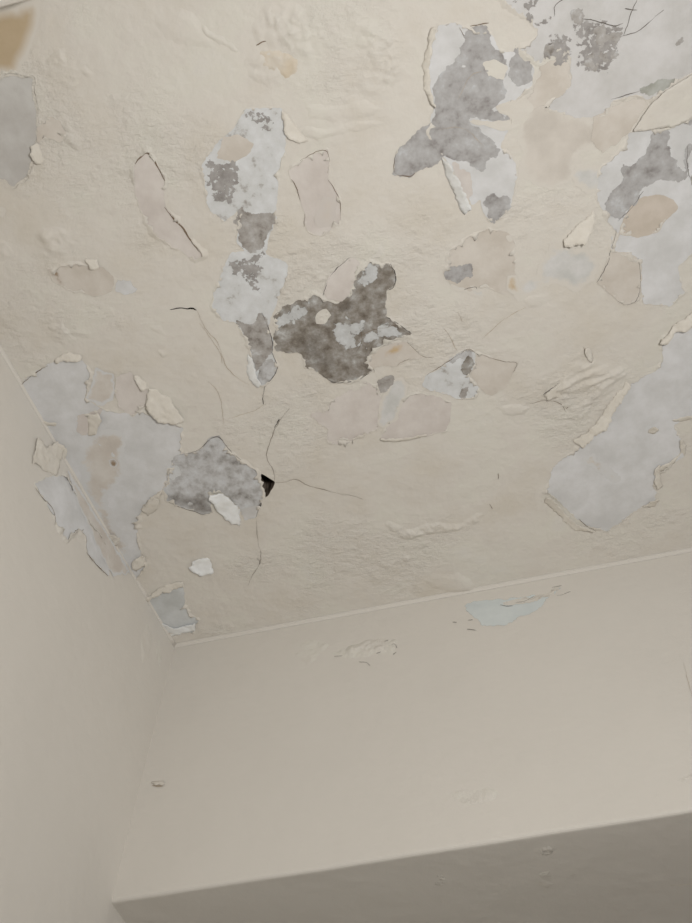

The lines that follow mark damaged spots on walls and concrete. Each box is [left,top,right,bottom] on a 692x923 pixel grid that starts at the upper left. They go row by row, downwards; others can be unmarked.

peeling [0,70,66,190]
peeling [129,145,209,263]
spalling [198,106,412,388]
peeling [392,0,692,307]
spalling [421,348,519,400]
peeling [22,352,275,581]
peeling [146,582,200,636]